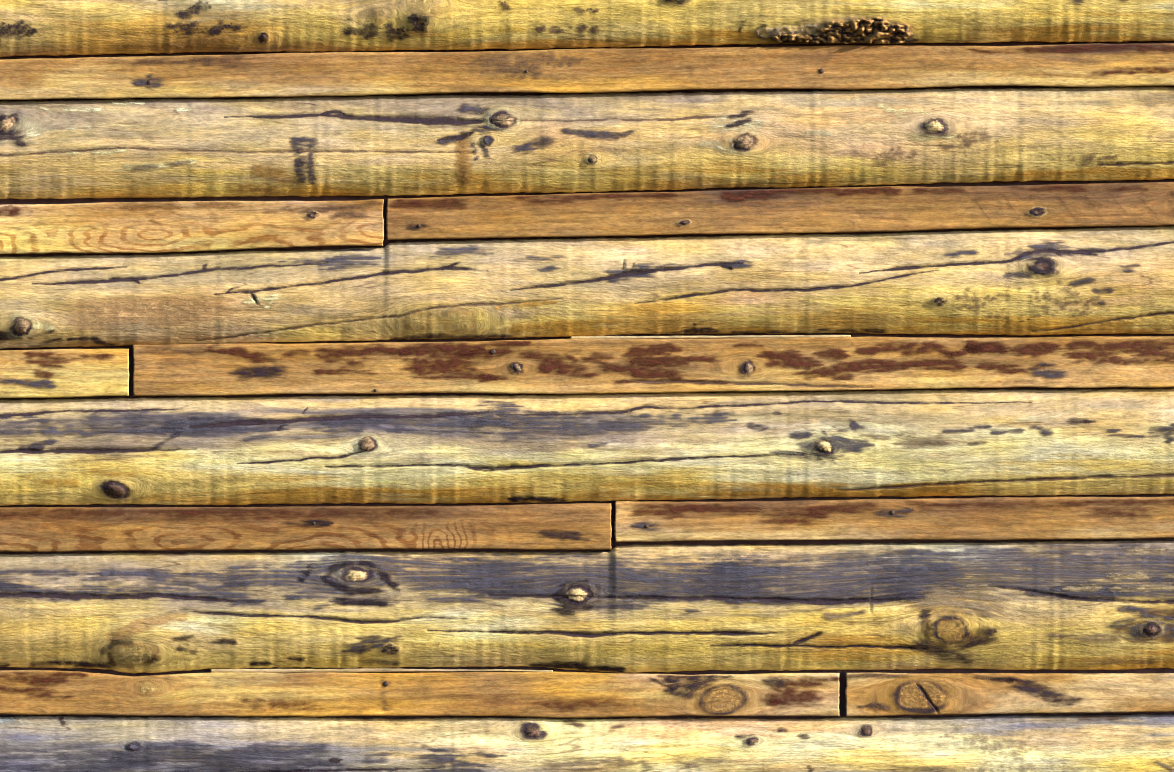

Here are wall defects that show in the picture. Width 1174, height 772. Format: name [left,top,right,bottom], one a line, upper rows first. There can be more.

crack [0,263,481,304]
crack [199,241,1174,341]
crack [0,381,1032,454]
crack [237,451,804,471]
crack [489,589,905,610]
crack [988,585,1174,604]
crack [0,593,923,649]
crack [916,684,939,714]